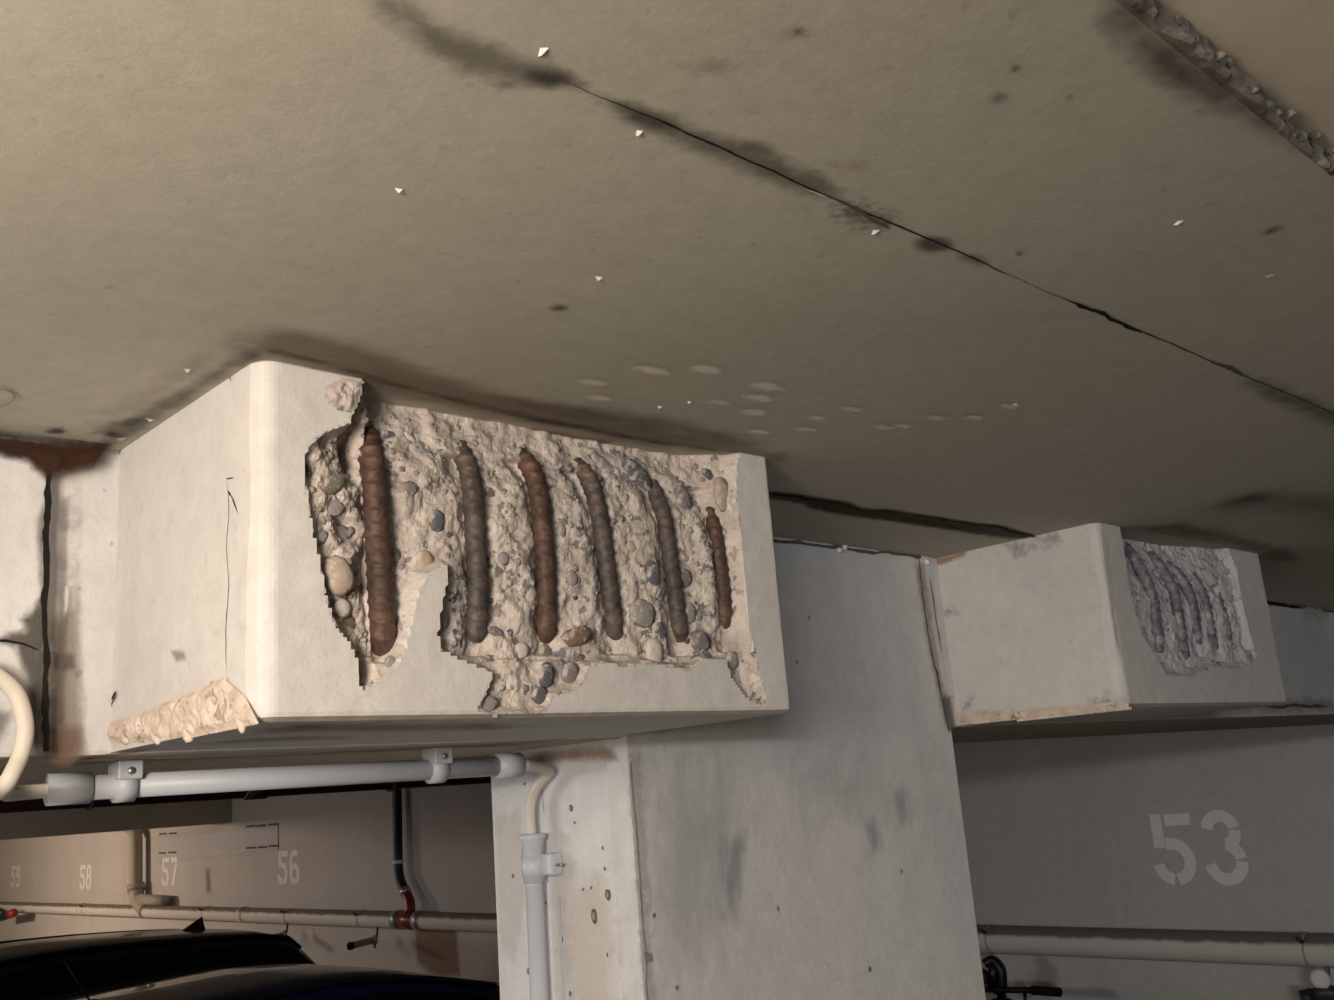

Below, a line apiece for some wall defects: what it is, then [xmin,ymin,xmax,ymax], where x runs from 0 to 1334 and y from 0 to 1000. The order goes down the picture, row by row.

spalling [1115,0,1334,178]
crack [574,85,1334,414]
crack [0,474,52,752]
spalling [107,677,258,745]
spalling [304,377,767,717]
crack [769,493,1054,731]
spalling [1120,531,1257,679]